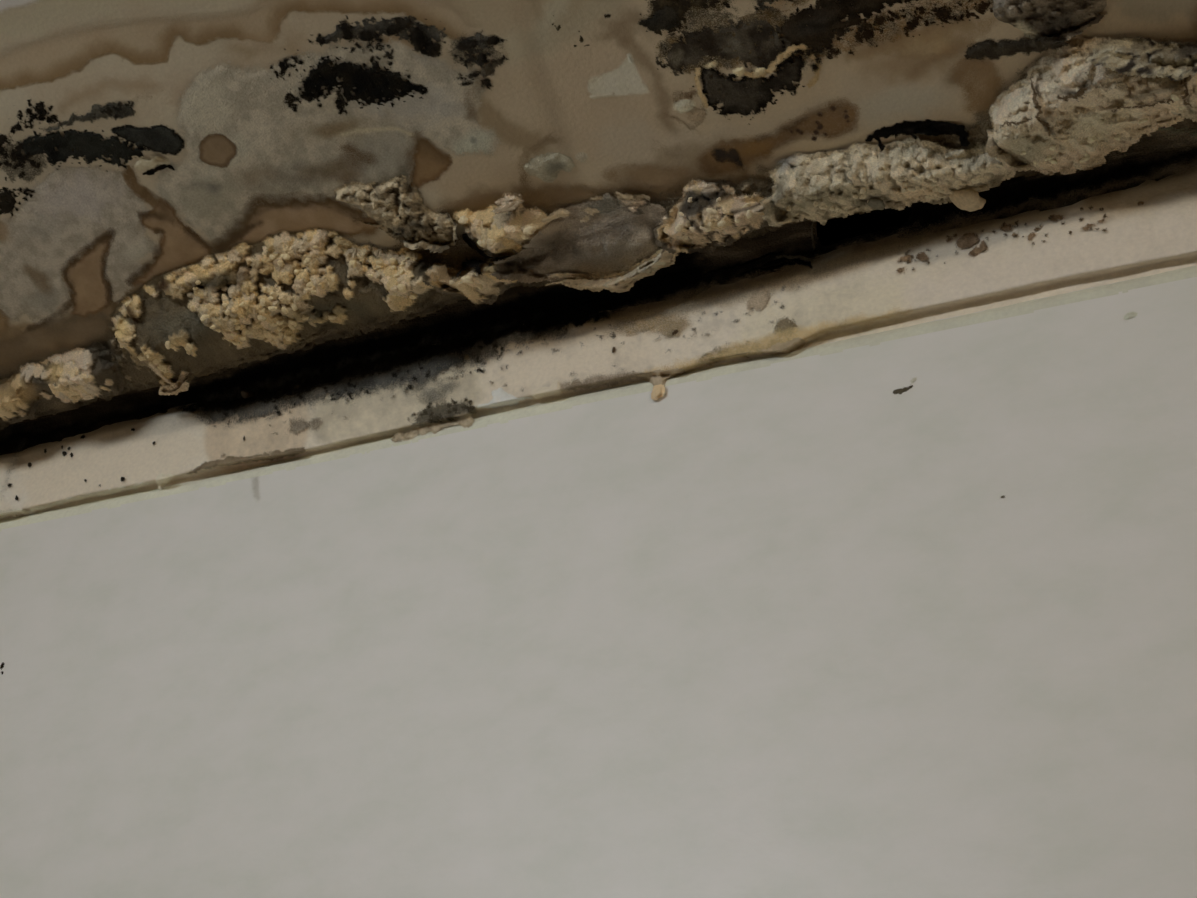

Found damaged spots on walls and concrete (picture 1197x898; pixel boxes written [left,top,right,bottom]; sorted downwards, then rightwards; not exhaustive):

flaking render [0,173,584,430]
water stain [0,0,1055,380]
water stain [176,156,1197,440]
flaking render [617,33,1197,255]
water stain [1079,0,1197,44]
water stain [1,438,32,500]